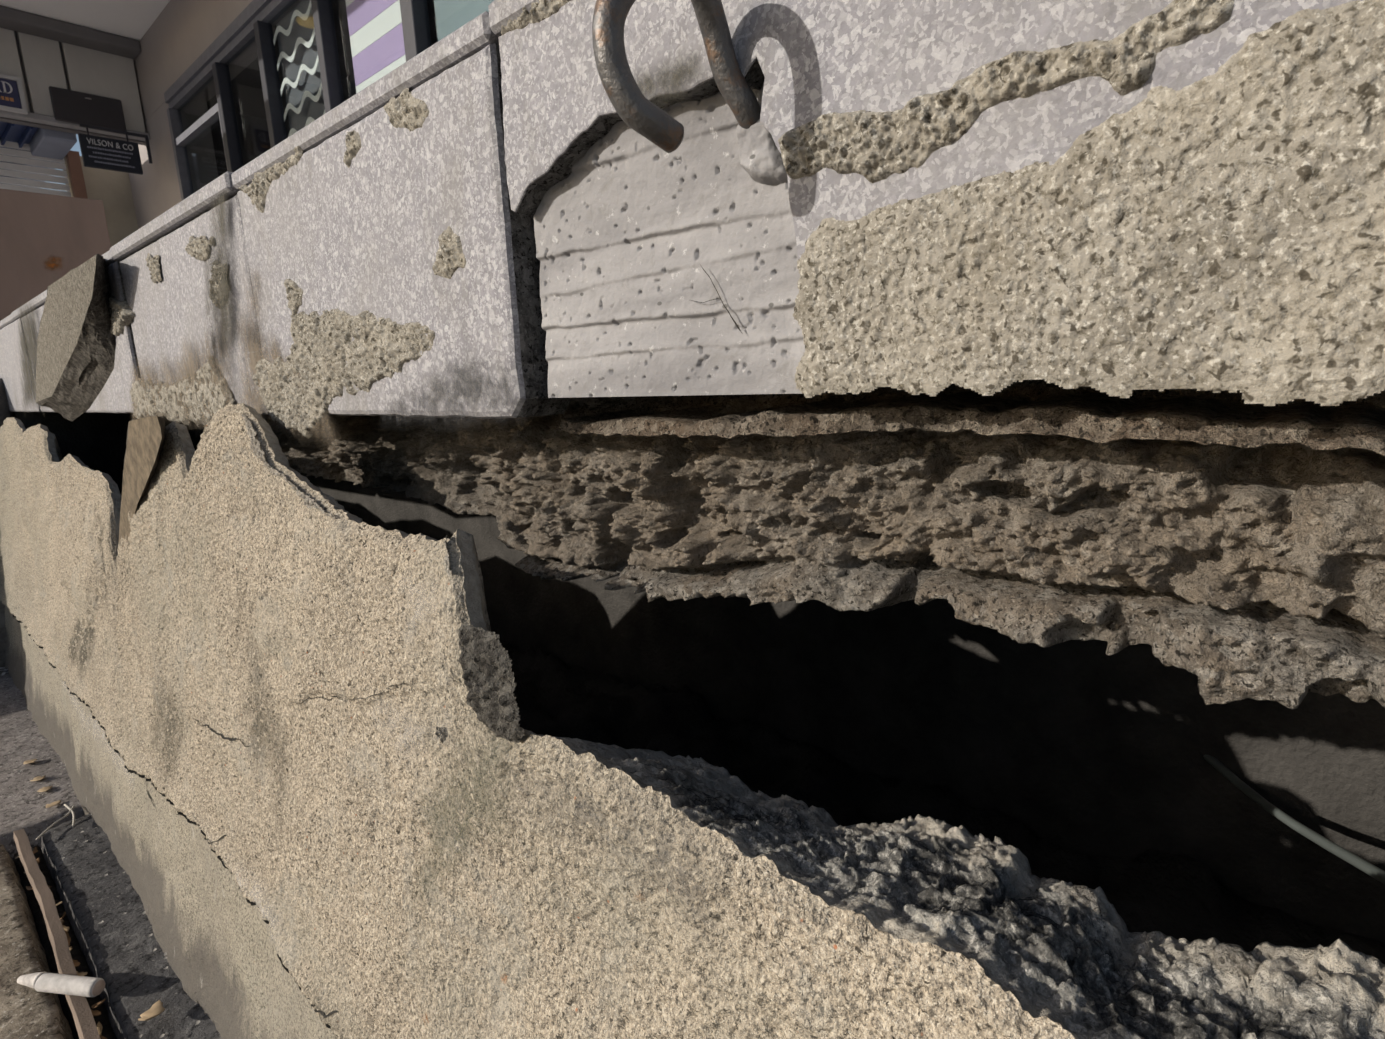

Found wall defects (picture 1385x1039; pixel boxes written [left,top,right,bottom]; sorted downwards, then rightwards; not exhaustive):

spalling [240,84,1385,709]
crack [287,681,427,707]
spalling [435,727,448,743]
spalling [458,623,524,743]
crack [13,615,337,1029]